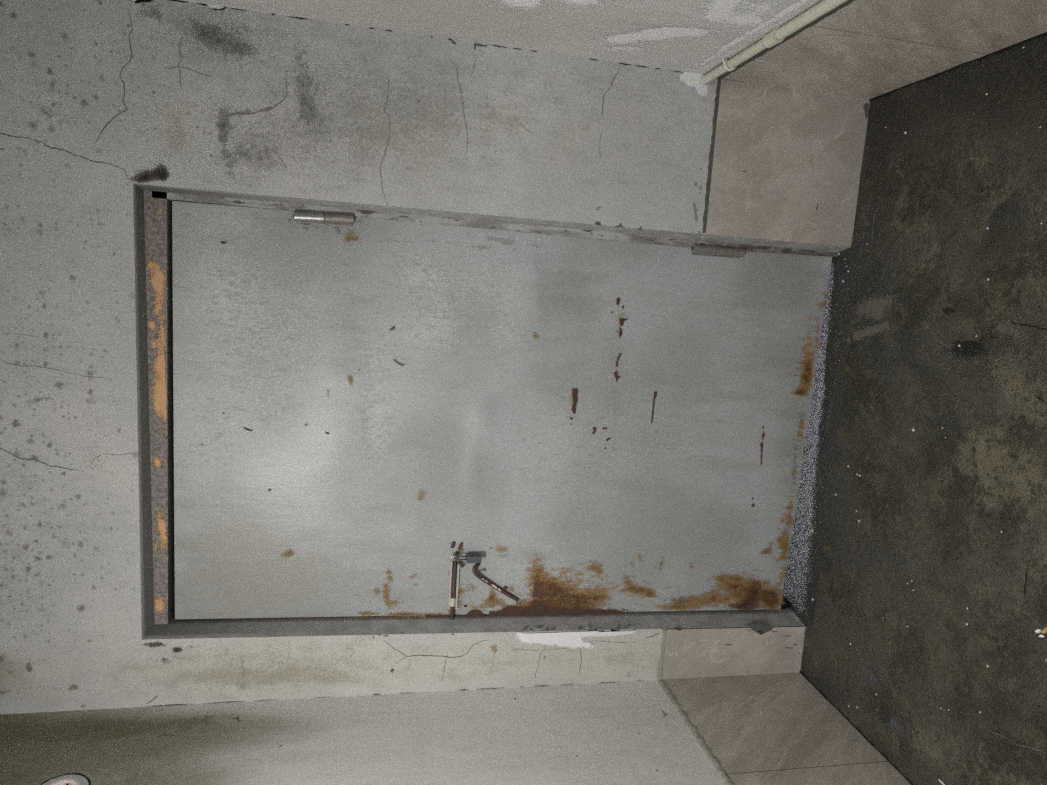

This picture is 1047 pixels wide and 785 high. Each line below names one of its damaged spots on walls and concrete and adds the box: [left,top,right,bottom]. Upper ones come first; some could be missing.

crack [163,32,208,86]
water stain [192,20,255,57]
crack [0,6,133,182]
crack [222,70,287,121]
crack [456,45,537,155]
water stain [217,107,272,176]
crack [380,82,390,201]
rust [761,279,828,565]
rust [278,553,786,620]
crack [145,648,277,707]
crack [385,633,660,691]